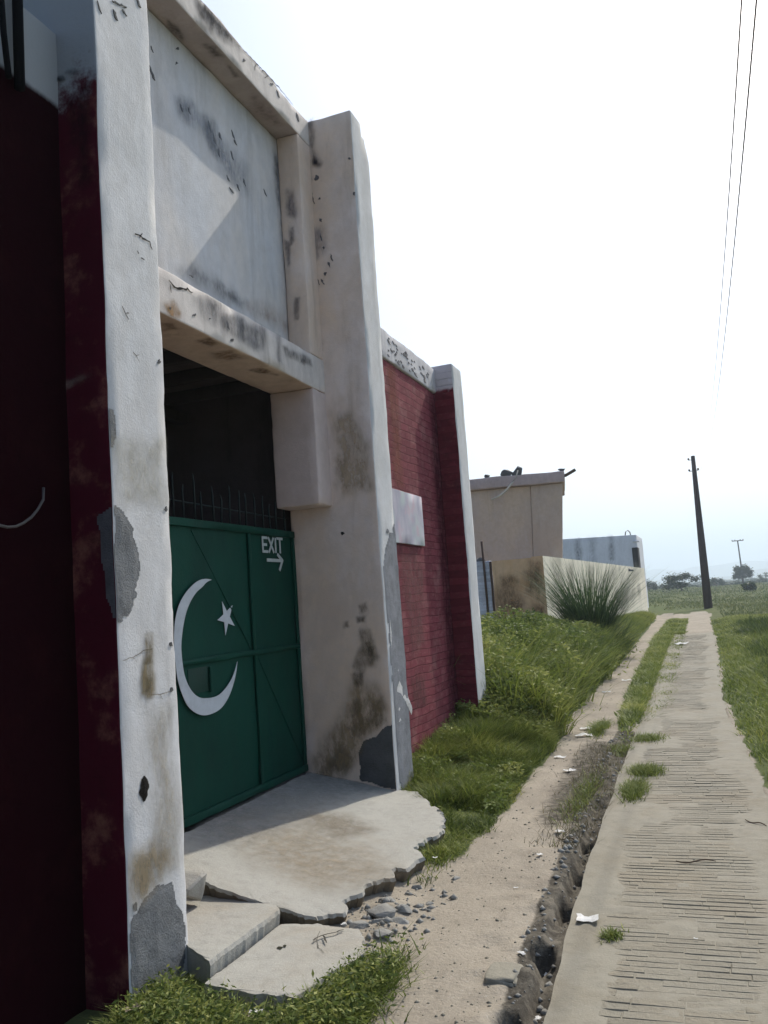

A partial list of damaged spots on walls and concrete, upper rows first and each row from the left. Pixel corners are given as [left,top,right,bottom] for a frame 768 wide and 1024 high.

peeling [387,337,429,383]
spalling [97,505,140,623]
spalling [359,524,414,790]
damp [319,685,382,776]
spalling [130,882,186,1001]